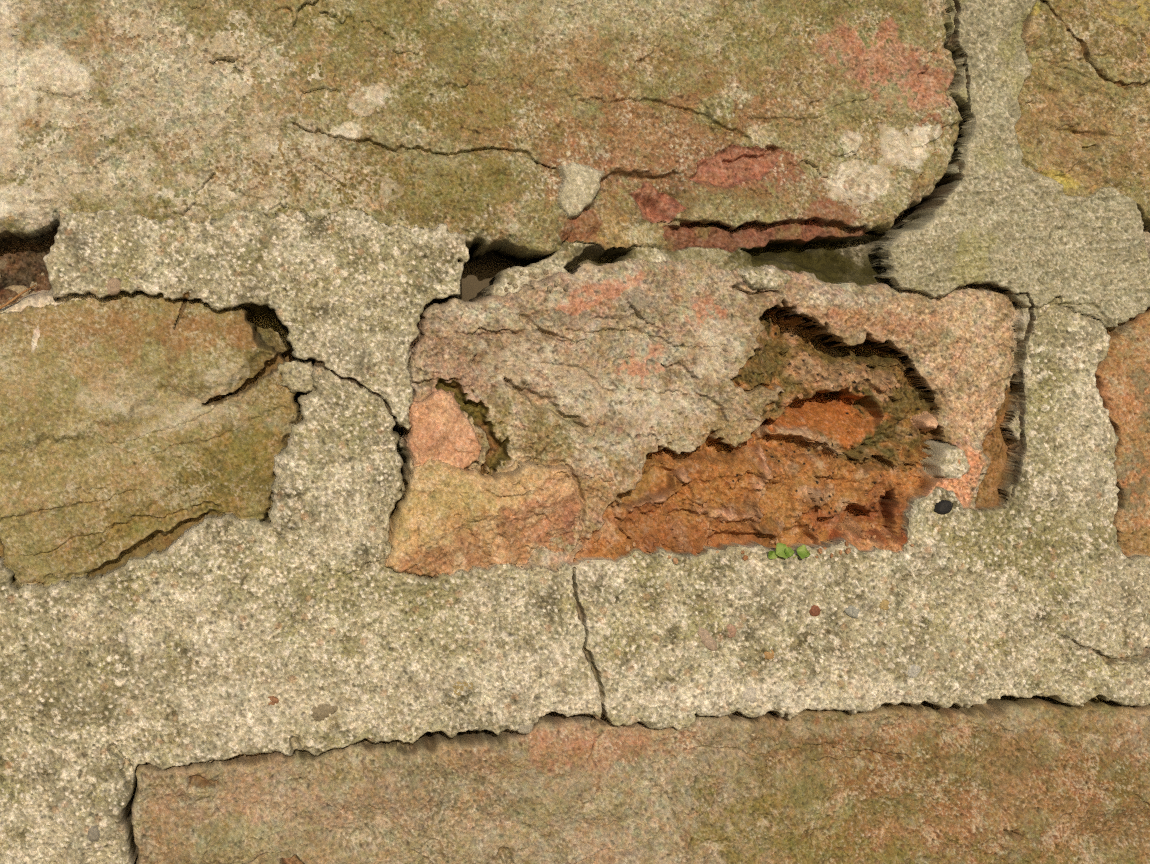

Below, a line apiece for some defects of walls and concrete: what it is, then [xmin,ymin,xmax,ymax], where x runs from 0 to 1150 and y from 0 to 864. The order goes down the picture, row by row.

peeling [552,266,667,316]
peeling [682,292,730,328]
peeling [738,265,792,293]
spalling [573,303,971,565]
crack [572,567,608,718]
crack [1060,635,1150,666]